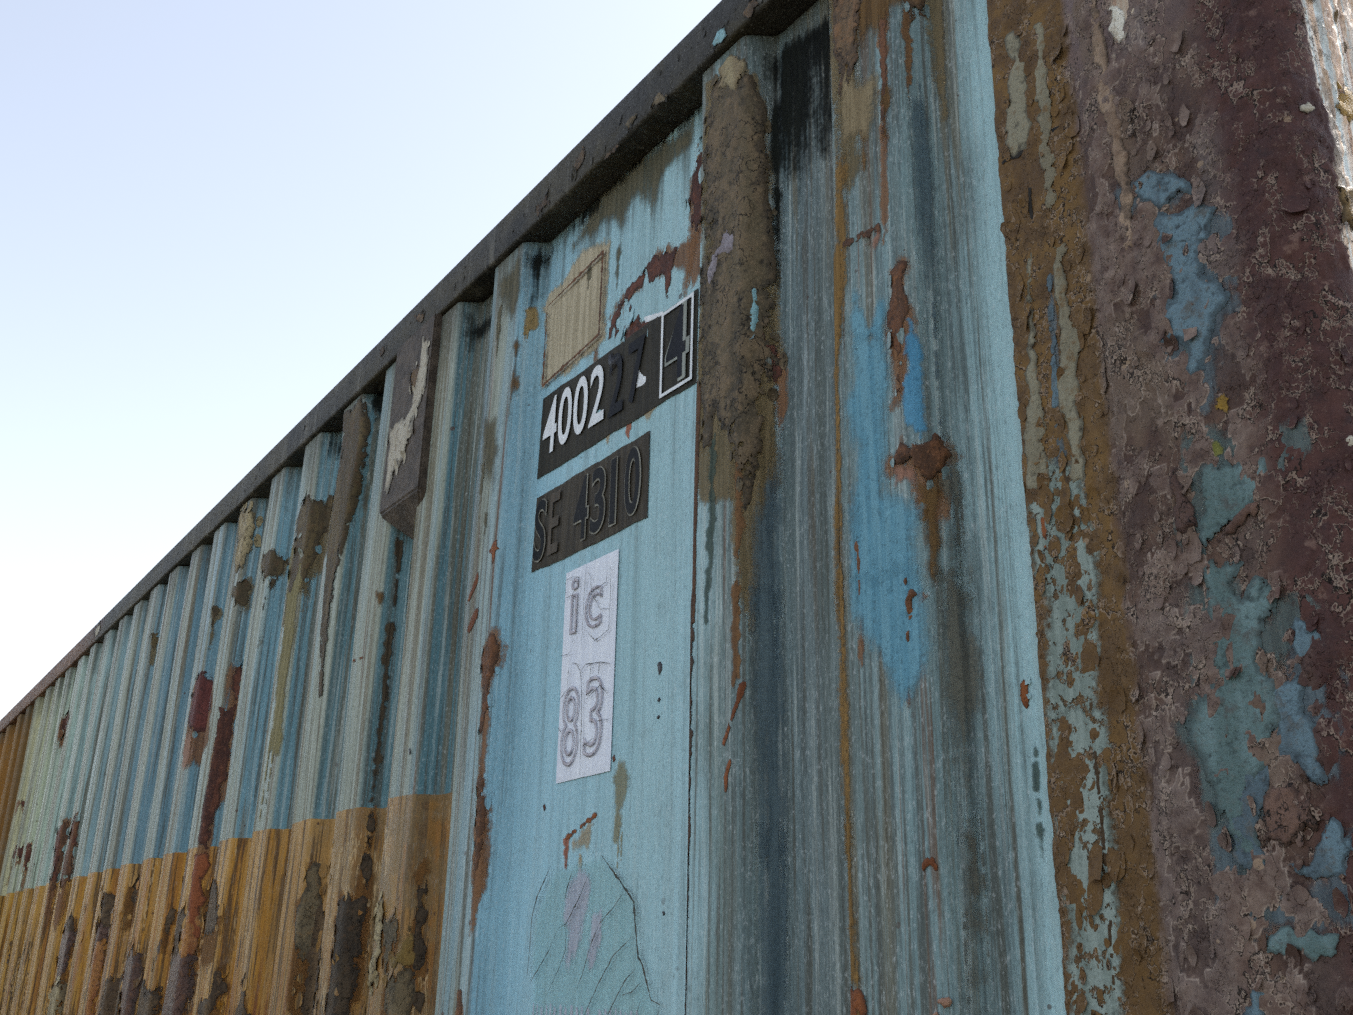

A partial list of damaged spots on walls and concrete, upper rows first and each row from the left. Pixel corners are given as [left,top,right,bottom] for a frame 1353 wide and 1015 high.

rust [182,655,243,957]
rust [209,487,336,821]
peeling [384,336,430,494]
rust [470,628,508,931]
rust [594,132,705,362]
rust [749,333,788,426]
rust [883,433,958,642]
peeling [1014,228,1108,595]
peeling [1075,834,1155,970]
peeling [1000,0,1240,410]
peeling [1152,397,1353,967]
peeling [1279,102,1315,122]